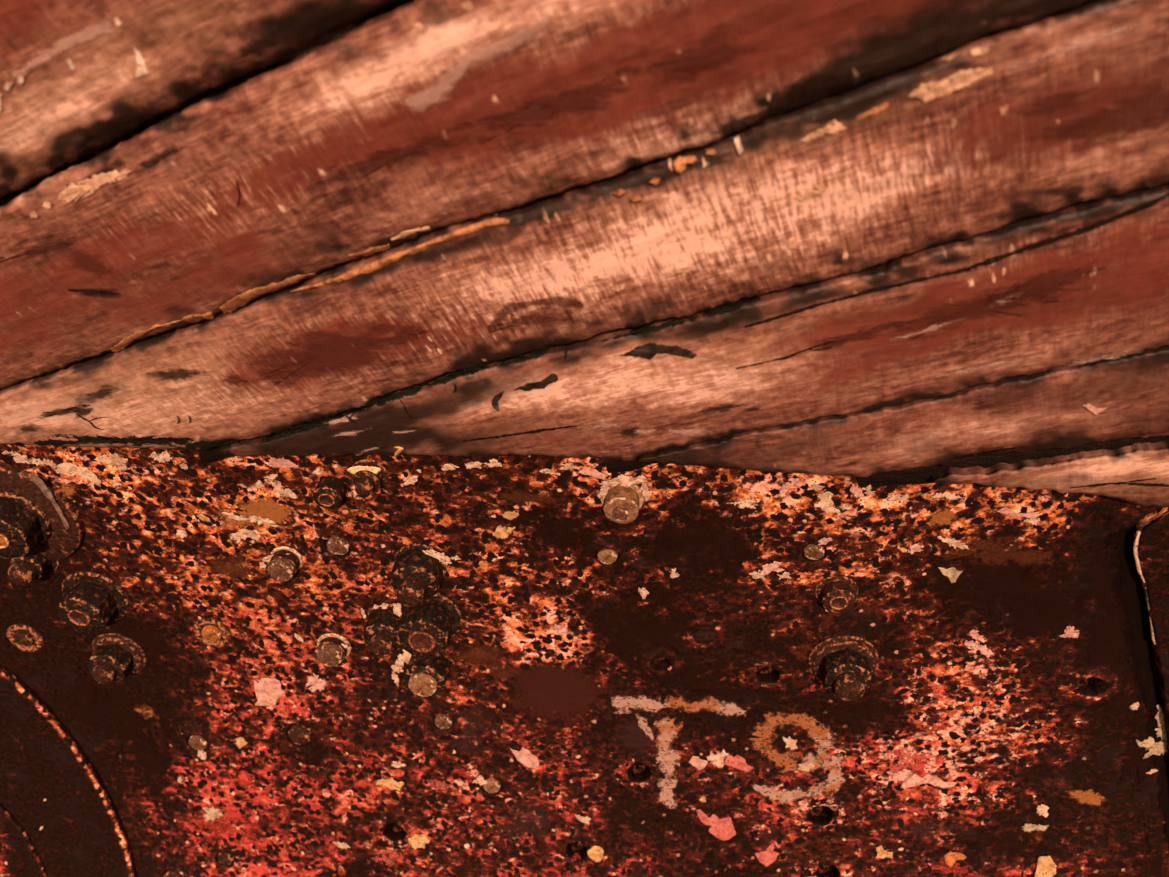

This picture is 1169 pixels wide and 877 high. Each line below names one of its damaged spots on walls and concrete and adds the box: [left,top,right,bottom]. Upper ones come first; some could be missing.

crack [744,192,1169,328]
crack [736,340,838,369]
peeling [2,450,129,530]
peeling [254,458,324,499]
peeling [780,478,874,515]
corrosion [799,695,925,744]
corrosion [1079,526,1169,877]
peeling [1136,704,1168,774]
corrosion [1069,789,1104,806]
corrosion [656,795,775,877]
corrosion [934,820,1060,862]
peeling [1034,856,1057,877]